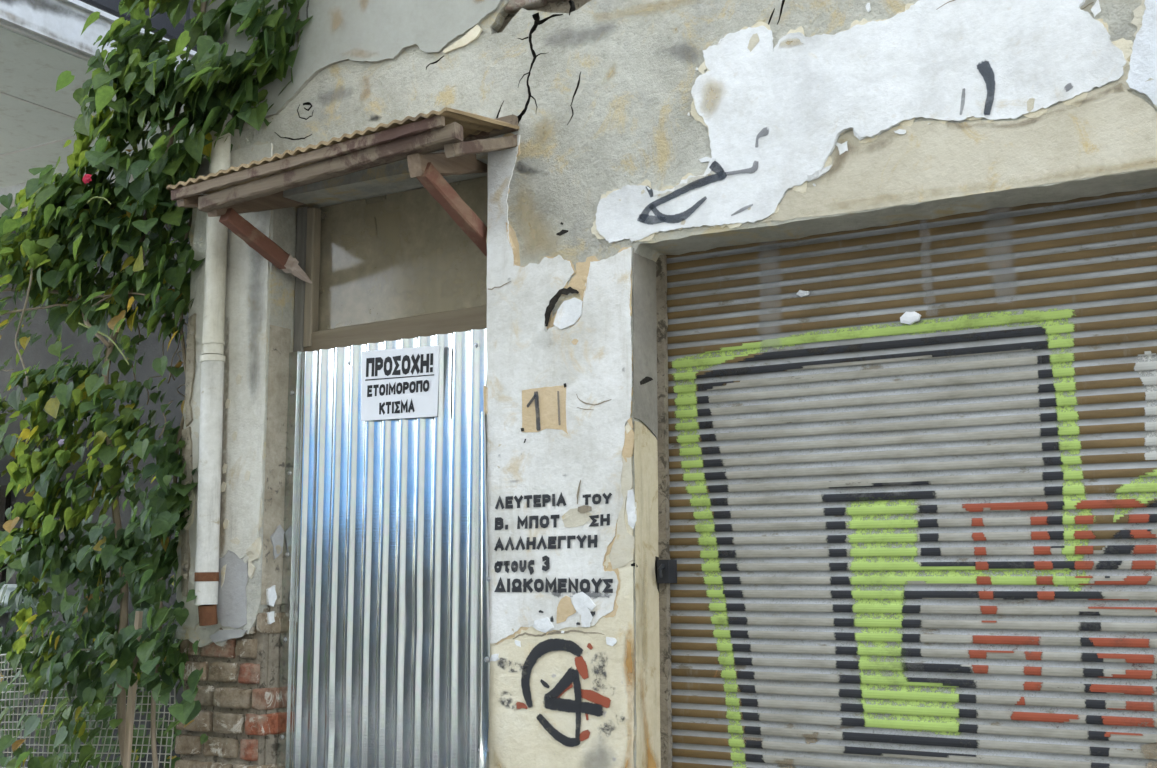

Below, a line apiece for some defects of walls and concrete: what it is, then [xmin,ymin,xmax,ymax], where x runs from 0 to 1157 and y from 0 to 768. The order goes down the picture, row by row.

flaking render [206,0,591,124]
crack [496,0,576,124]
peeling [198,156,209,176]
peeling [230,138,273,167]
peeling [483,0,1157,768]
peeling [175,194,291,768]